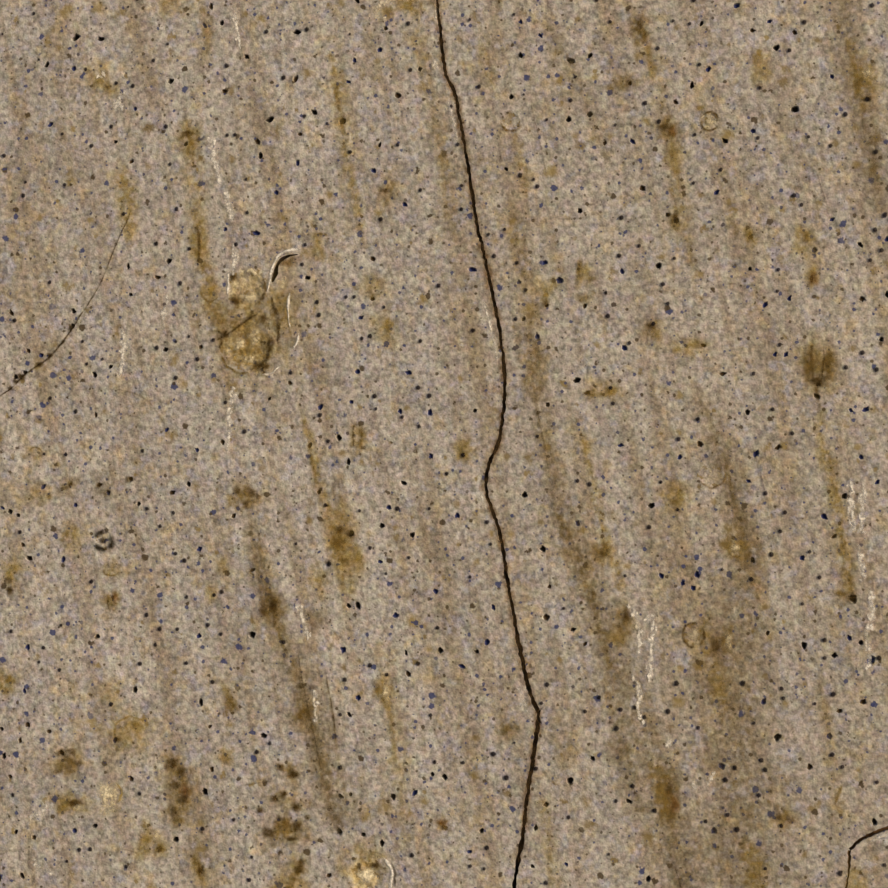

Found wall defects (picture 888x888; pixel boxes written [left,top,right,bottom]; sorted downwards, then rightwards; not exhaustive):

spalling [219,249,298,376]
crack [433,0,541,888]
crack [845,826,888,888]